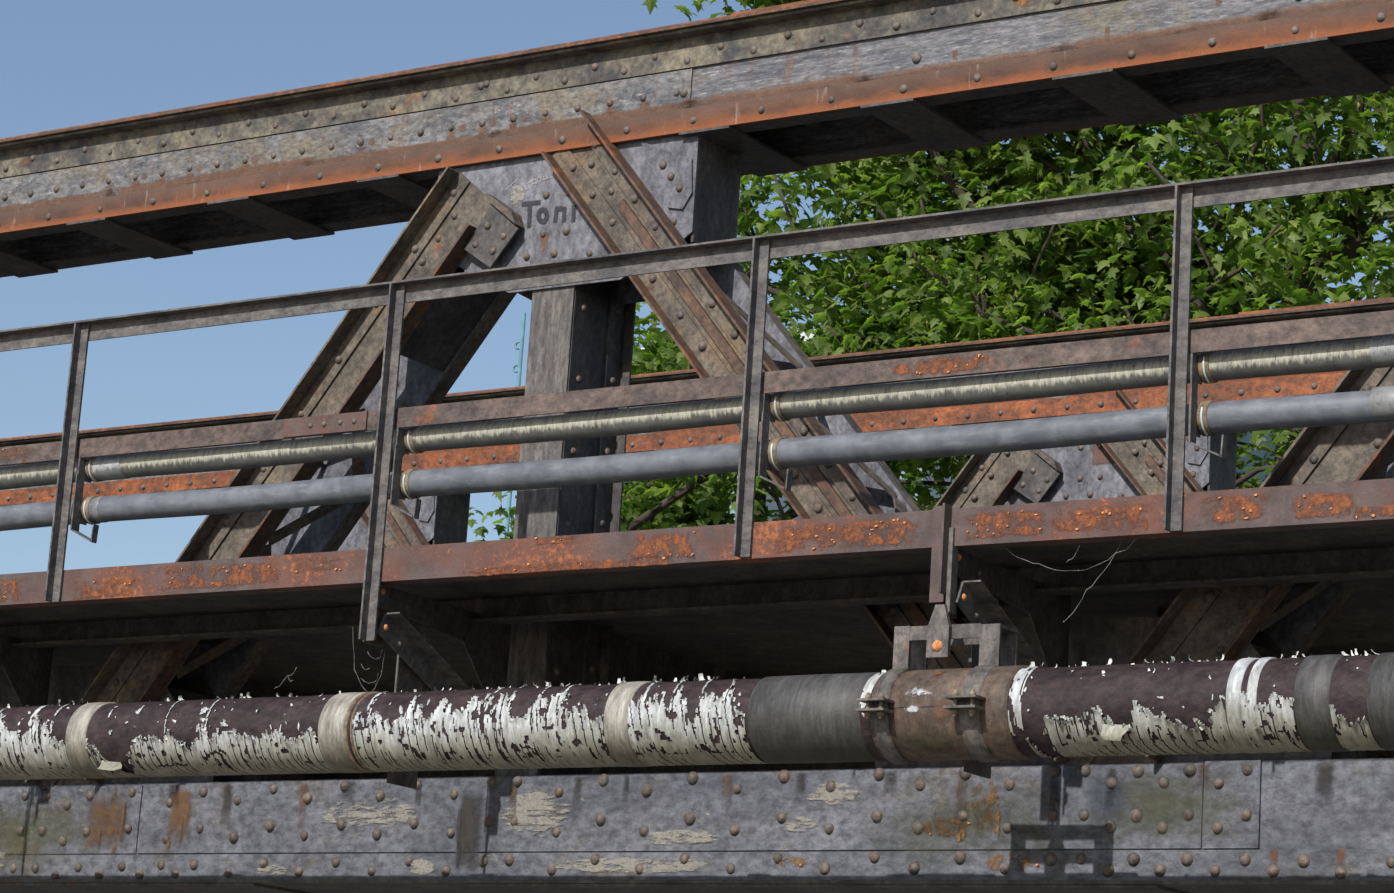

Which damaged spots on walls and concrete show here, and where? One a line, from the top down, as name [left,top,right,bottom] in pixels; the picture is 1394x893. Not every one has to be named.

rust [0,0,1394,234]
rust [776,518,915,553]
rust [967,504,1148,538]
rust [1202,494,1264,523]
rust [1295,493,1394,519]
rust [162,562,276,590]
peeling [0,691,341,780]
peeling [352,673,769,772]
peeling [1008,654,1313,758]
peeling [1329,704,1384,751]